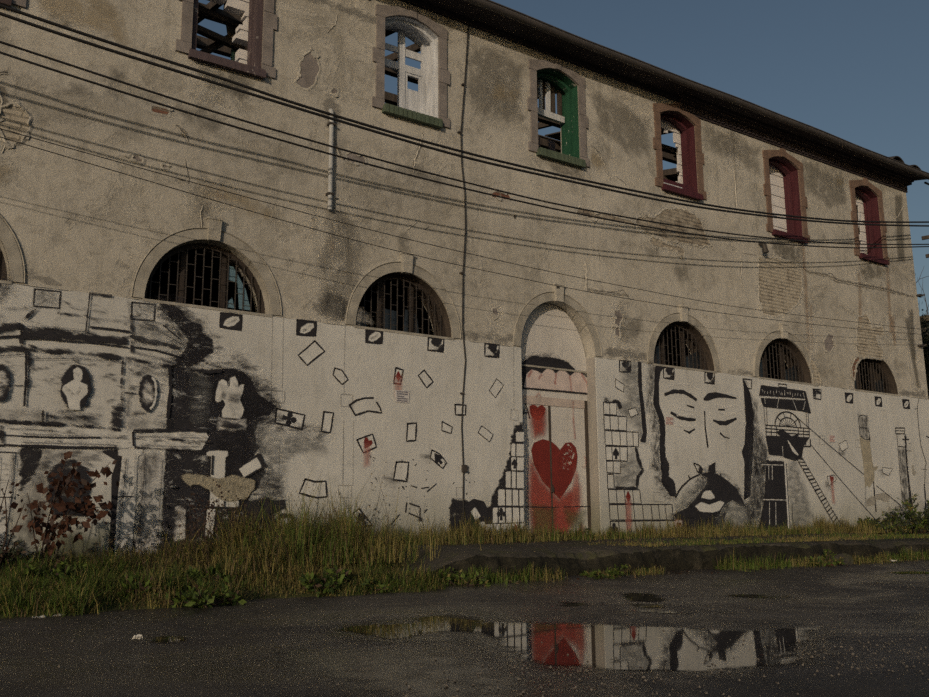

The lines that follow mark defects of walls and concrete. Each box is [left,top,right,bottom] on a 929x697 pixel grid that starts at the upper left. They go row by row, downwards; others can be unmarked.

flaking render [293,47,322,91]
flaking render [575,205,713,260]
flaking render [757,256,803,318]